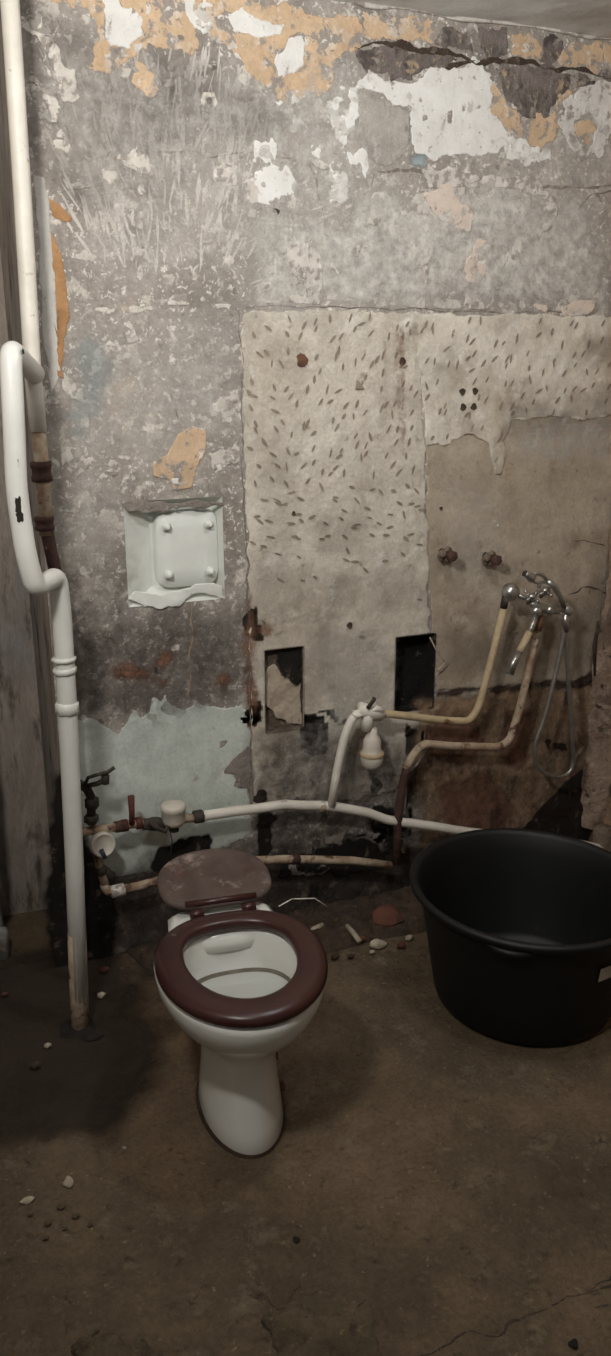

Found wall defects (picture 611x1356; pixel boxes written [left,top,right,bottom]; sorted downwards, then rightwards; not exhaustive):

crack [357,39,611,79]
peeling [25,0,611,283]
peeling [33,175,72,392]
peeling [286,243,323,291]
peeling [153,426,207,491]
peeling [78,646,303,877]
crack [420,1276,611,1356]